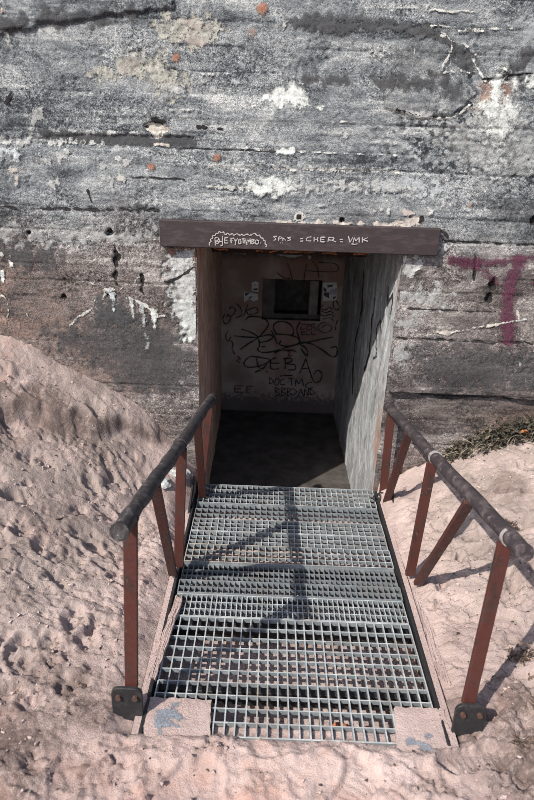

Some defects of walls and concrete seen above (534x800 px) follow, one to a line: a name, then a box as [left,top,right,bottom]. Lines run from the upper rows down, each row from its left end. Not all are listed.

peeling [80,8,231,105]
crack [396,2,534,82]
spalling [144,116,170,147]
spalling [261,80,325,111]
crack [394,104,470,120]
damp [92,288,165,349]